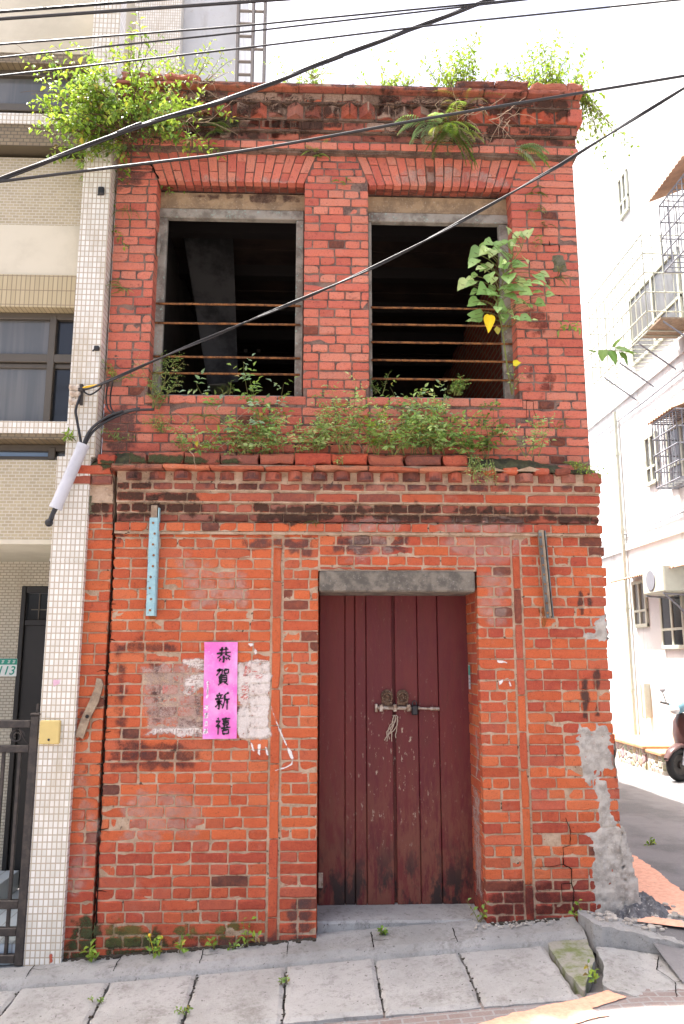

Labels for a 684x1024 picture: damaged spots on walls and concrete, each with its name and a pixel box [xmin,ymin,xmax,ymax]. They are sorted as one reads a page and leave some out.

water stain [182,81,356,143]
water stain [372,83,570,148]
water stain [450,506,599,526]
peeling [182,658,204,695]
crack [94,468,122,971]
peeling [147,725,202,738]
peeling [592,728,623,864]
crack [537,819,574,905]
water stain [219,932,276,945]
water stain [287,900,312,940]